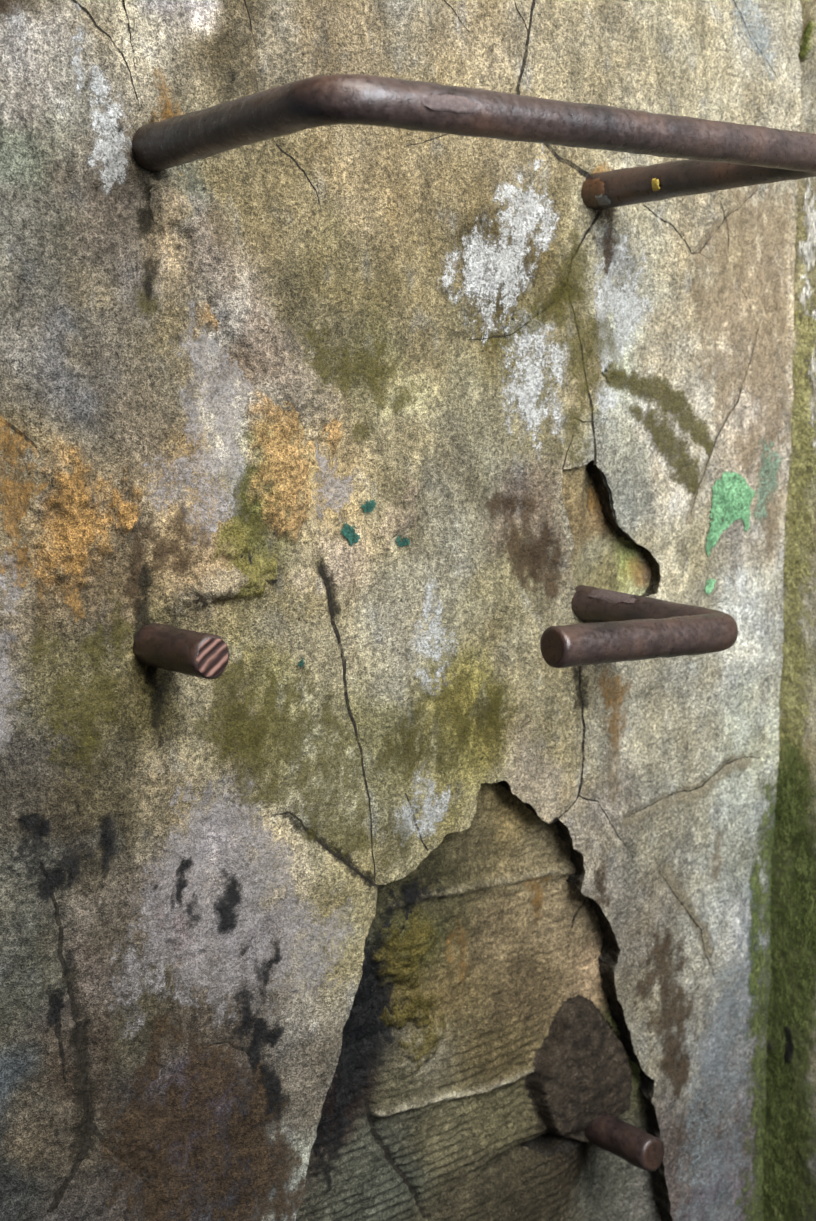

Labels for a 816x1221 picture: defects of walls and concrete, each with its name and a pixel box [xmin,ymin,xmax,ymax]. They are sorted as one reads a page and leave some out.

crack [72,0,140,111]
crack [514,0,535,95]
crack [733,0,776,75]
crack [276,144,322,213]
crack [545,144,590,178]
rust [581,165,611,206]
damp [442,175,567,448]
crack [271,558,379,890]
damp [61,813,124,887]
crack [405,793,429,851]
damp [47,953,74,1026]
spalling [100,780,673,1221]